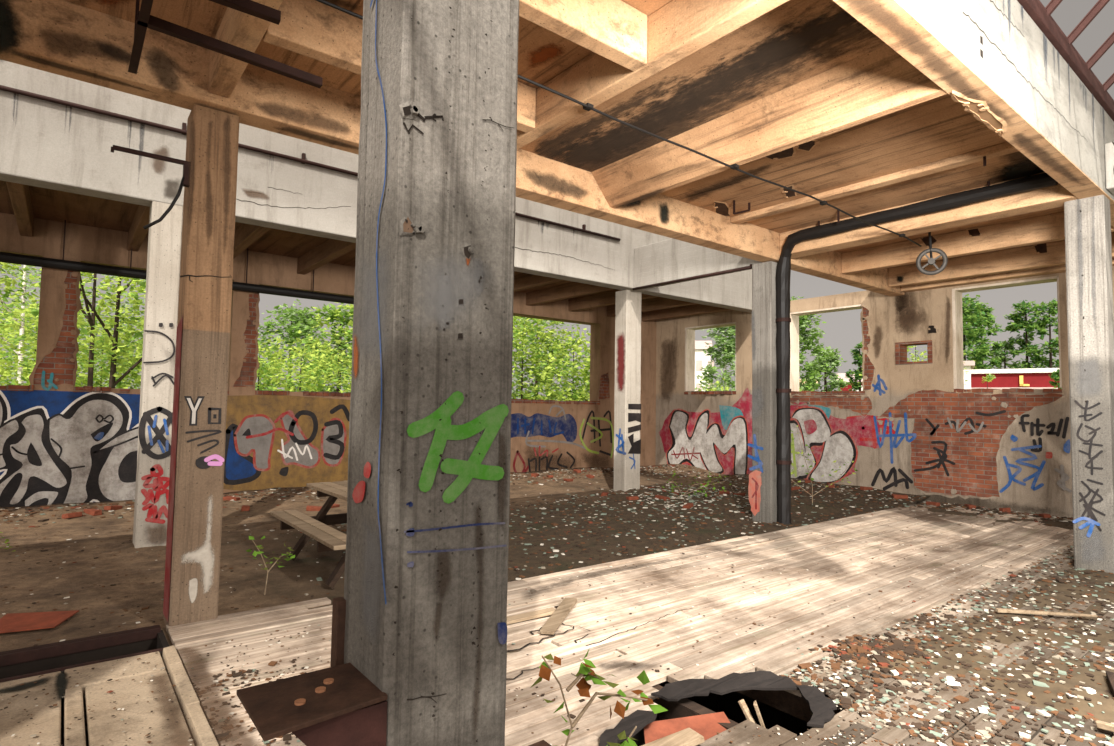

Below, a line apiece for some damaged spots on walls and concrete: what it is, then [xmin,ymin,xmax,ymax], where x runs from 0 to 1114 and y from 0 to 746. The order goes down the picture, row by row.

water stain [0,0,144,90]
water stain [150,51,177,90]
water stain [260,105,359,149]
water stain [529,173,584,196]
water stain [687,167,766,200]
water stain [535,0,1003,172]
water stain [1005,134,1077,180]
peeling [29,270,82,389]
peeling [231,292,260,390]
peeling [790,304,1066,500]